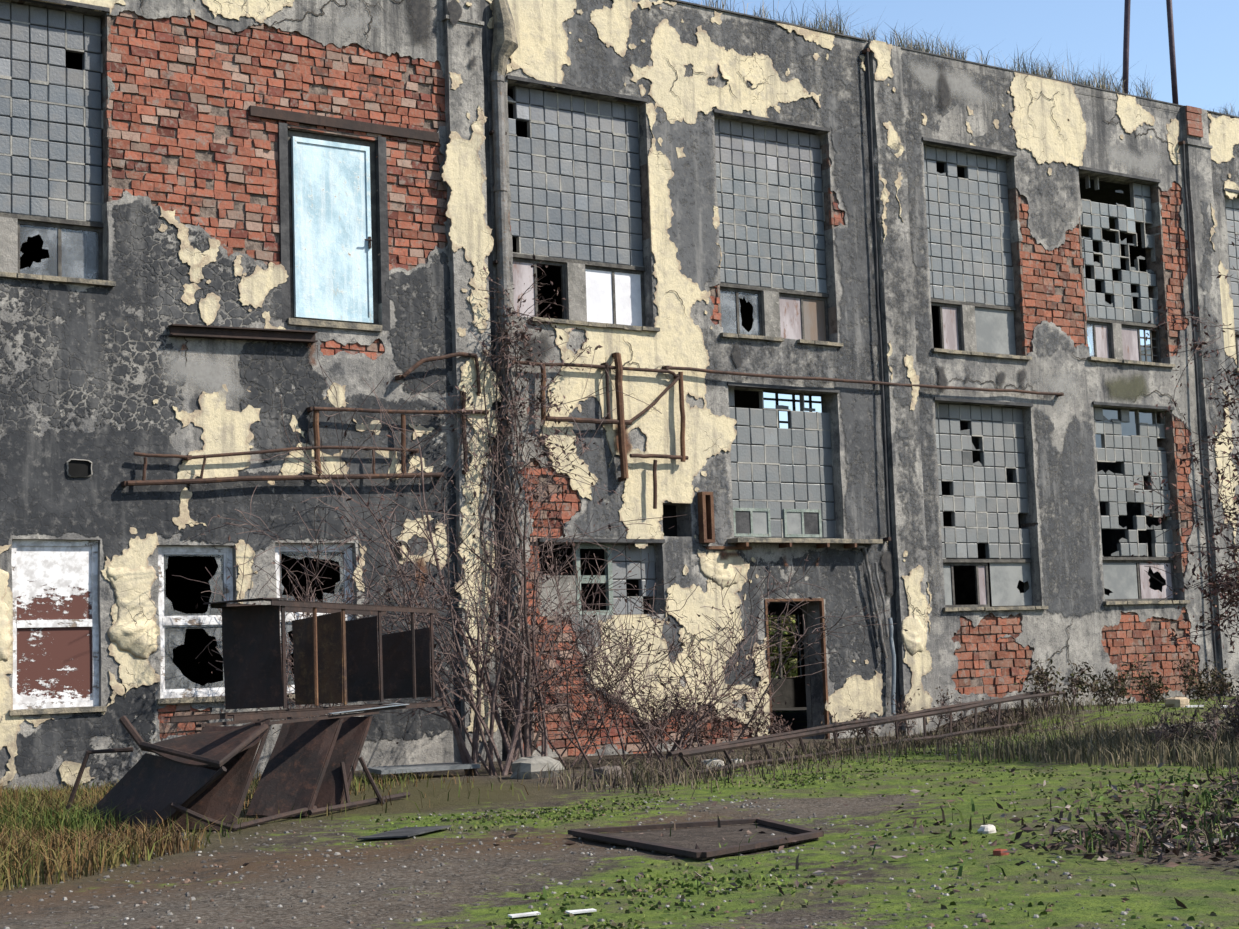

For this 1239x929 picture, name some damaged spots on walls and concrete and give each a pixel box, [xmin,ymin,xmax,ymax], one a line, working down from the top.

flaking render [0,0,502,742]
peeling [506,0,1088,757]
peeling [1031,409,1200,703]
flaking render [1116,94,1239,583]